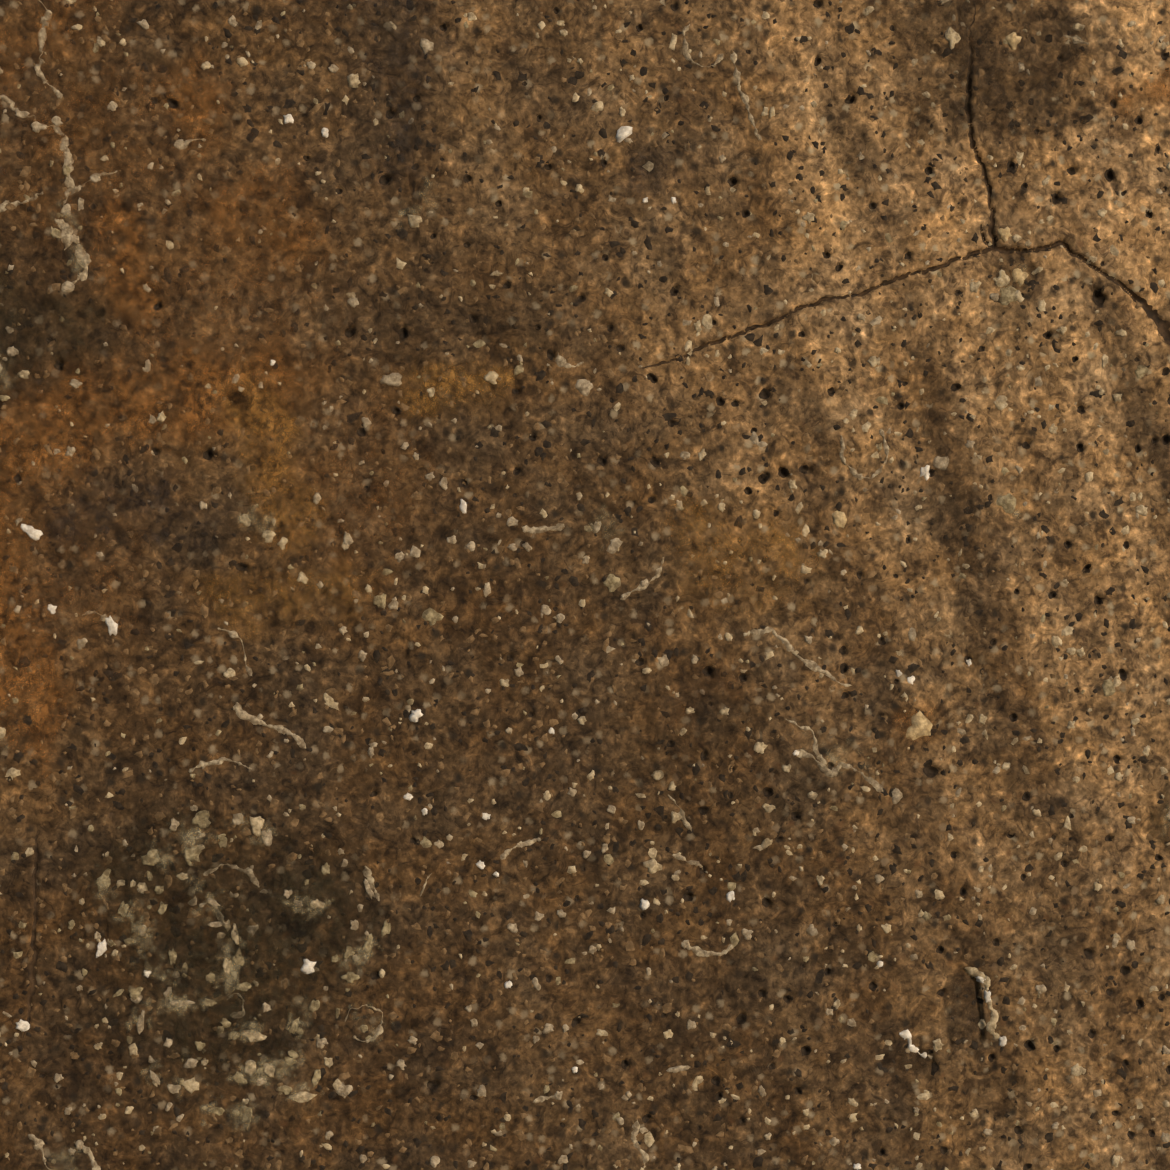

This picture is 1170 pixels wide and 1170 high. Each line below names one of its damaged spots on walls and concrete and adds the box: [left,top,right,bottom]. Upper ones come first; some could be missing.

crack [642,0,1170,369]